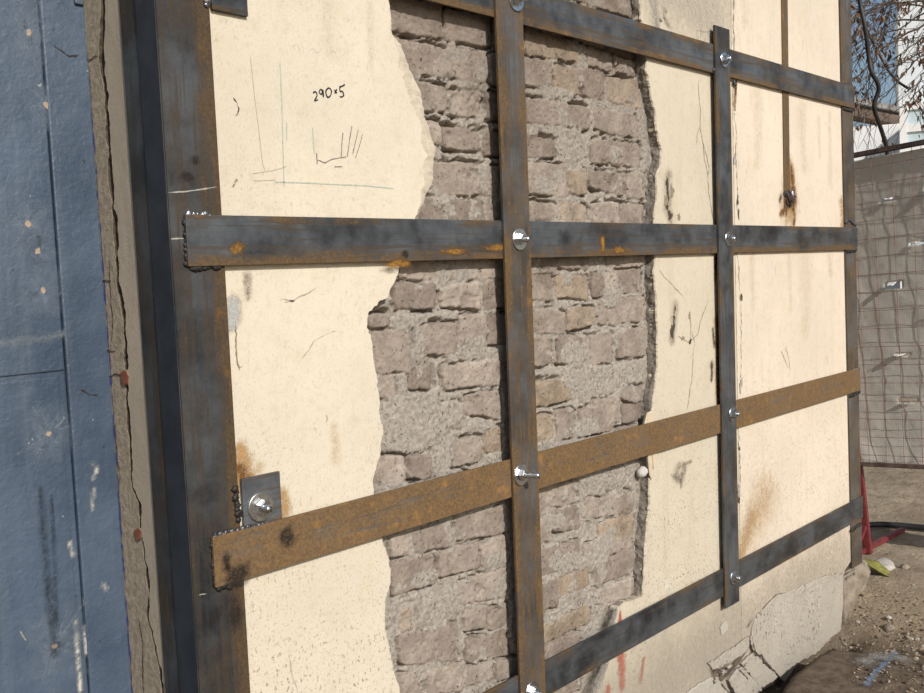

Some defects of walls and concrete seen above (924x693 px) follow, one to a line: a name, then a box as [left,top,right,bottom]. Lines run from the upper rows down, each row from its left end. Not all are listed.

flaking render [388,0,502,221]
flaking render [523,26,681,224]
crack [696,87,715,225]
corrosion [779,160,797,226]
corrosion [236,443,256,493]
corrosion [281,489,290,518]
flaking render [367,259,510,494]
flaking render [382,497,518,693]
flaking render [531,255,658,451]
flaking render [539,453,657,660]
crack [659,270,709,408]
flaking render [685,573,843,693]